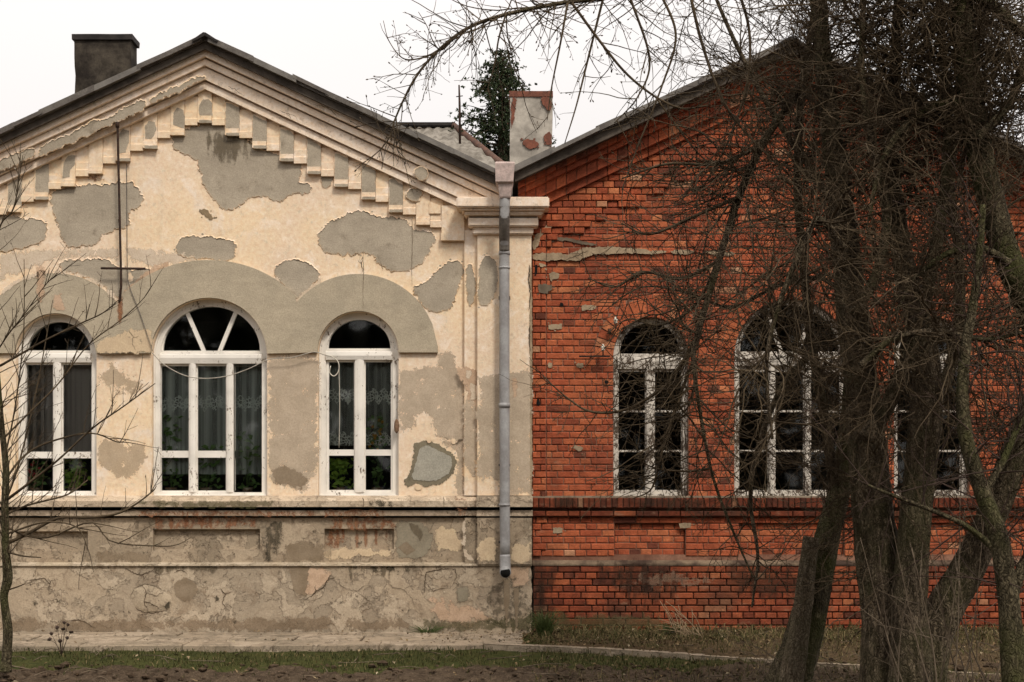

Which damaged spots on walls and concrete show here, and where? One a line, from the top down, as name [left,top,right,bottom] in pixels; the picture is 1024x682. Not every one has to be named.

flaking render [0,75,349,311]
flaking render [317,165,437,273]
peeling [520,132,554,149]
flaking render [413,253,499,313]
peeling [266,354,321,494]
peeling [396,263,559,496]
crack [307,568,466,620]